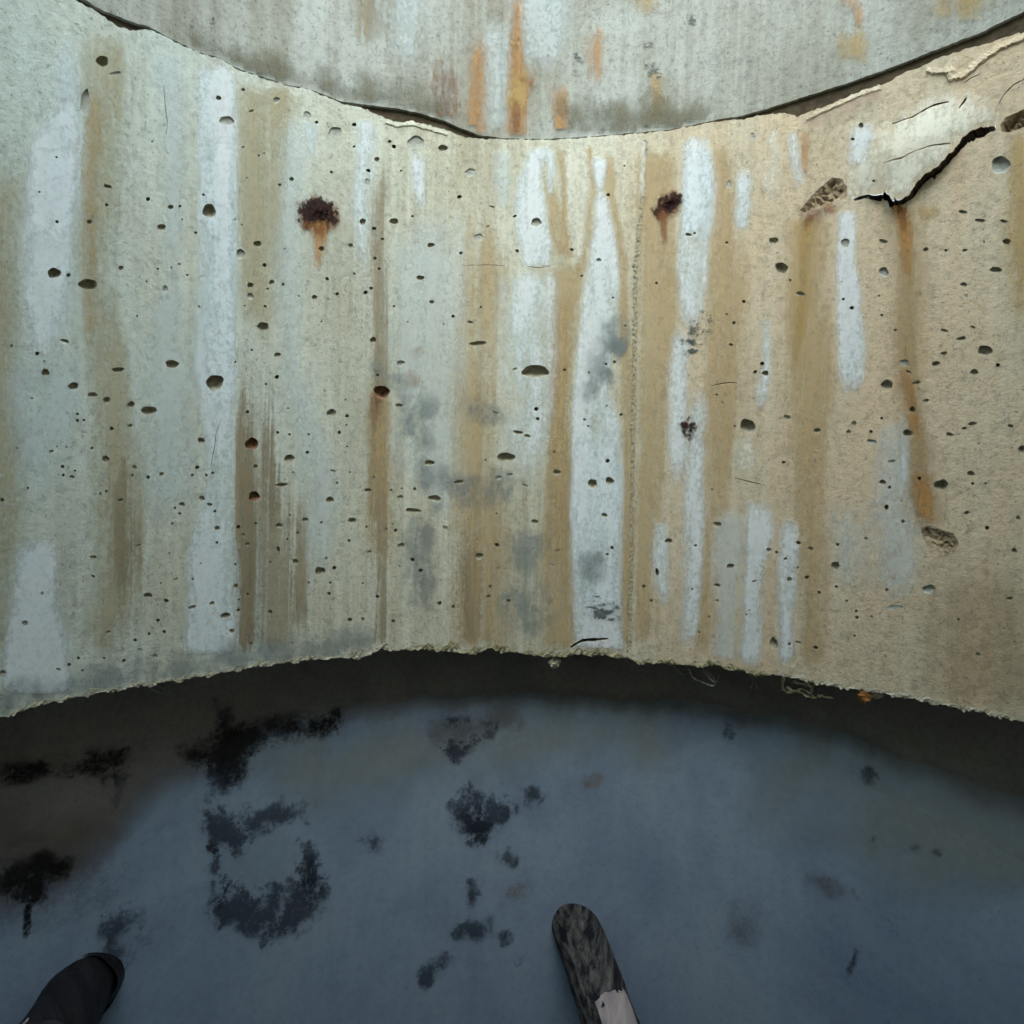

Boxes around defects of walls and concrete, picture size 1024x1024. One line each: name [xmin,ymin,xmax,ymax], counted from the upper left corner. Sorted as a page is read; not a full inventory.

corrosion [509,2,528,132]
peeling [926,32,1024,82]
corrosion [297,196,339,262]
corrosion [650,191,684,238]
spalling [798,177,848,214]
crack [853,74,1024,209]
damp [510,139,751,649]
damp [790,212,864,471]
corrosion [894,206,932,517]
spalling [921,526,959,556]
damp [179,698,341,794]
damp [201,804,331,947]